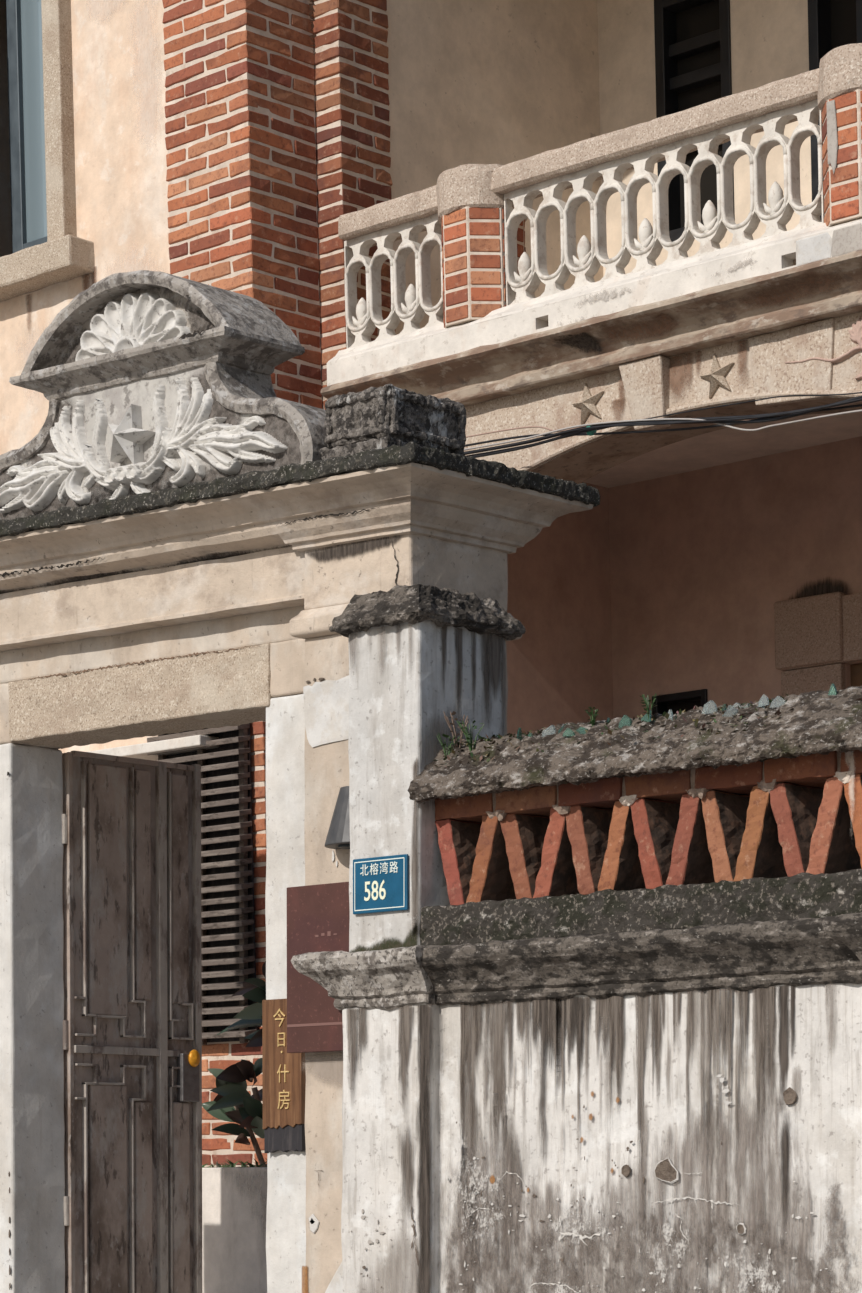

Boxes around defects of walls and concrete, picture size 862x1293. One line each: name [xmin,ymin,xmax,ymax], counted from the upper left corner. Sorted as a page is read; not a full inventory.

damp [379,623,411,665]
damp [413,627,506,779]
damp [370,985,855,1293]
spalling [612,1141,679,1184]